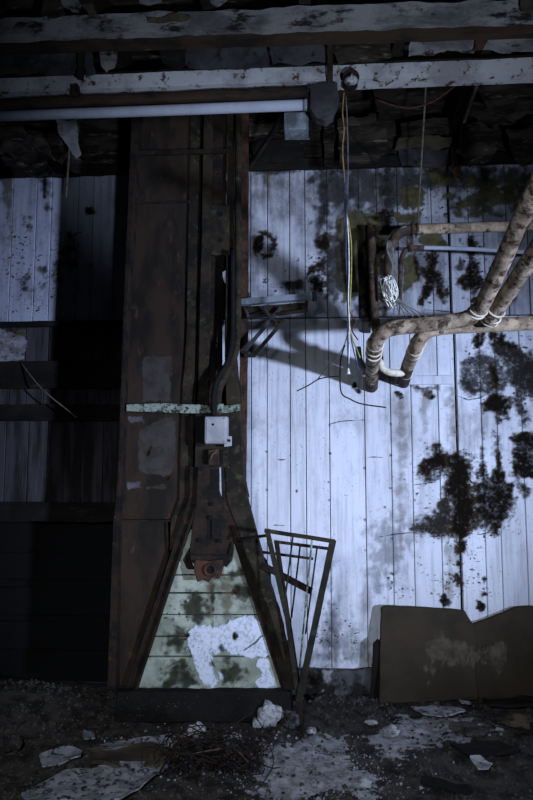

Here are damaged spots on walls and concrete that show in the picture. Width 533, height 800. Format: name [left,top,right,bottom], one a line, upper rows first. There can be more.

damp [253,230,278,259]
damp [342,235,391,326]
damp [263,165,531,306]
damp [409,332,533,586]
damp [230,567,251,600]
damp [160,591,210,689]
peeling [188,615,275,688]
damp [219,645,248,683]